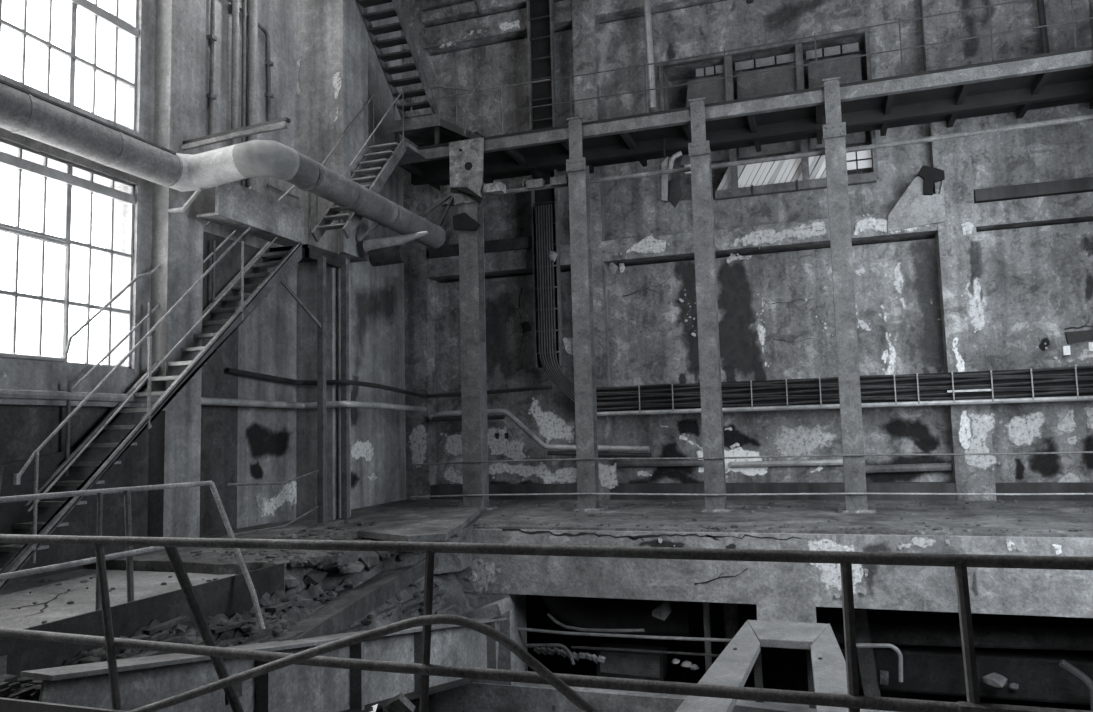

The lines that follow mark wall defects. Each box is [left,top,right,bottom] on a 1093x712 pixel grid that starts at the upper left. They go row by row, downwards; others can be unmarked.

spalling [727,221,826,264]
spalling [853,214,933,235]
water stain [717,261,766,382]
peeling [488,426,577,484]
peeling [528,397,575,444]
peeling [679,433,704,473]
peeling [724,419,837,478]
peeling [959,410,1046,471]
spalling [1057,407,1093,445]
crack [11,588,84,618]
spalling [437,529,1093,712]